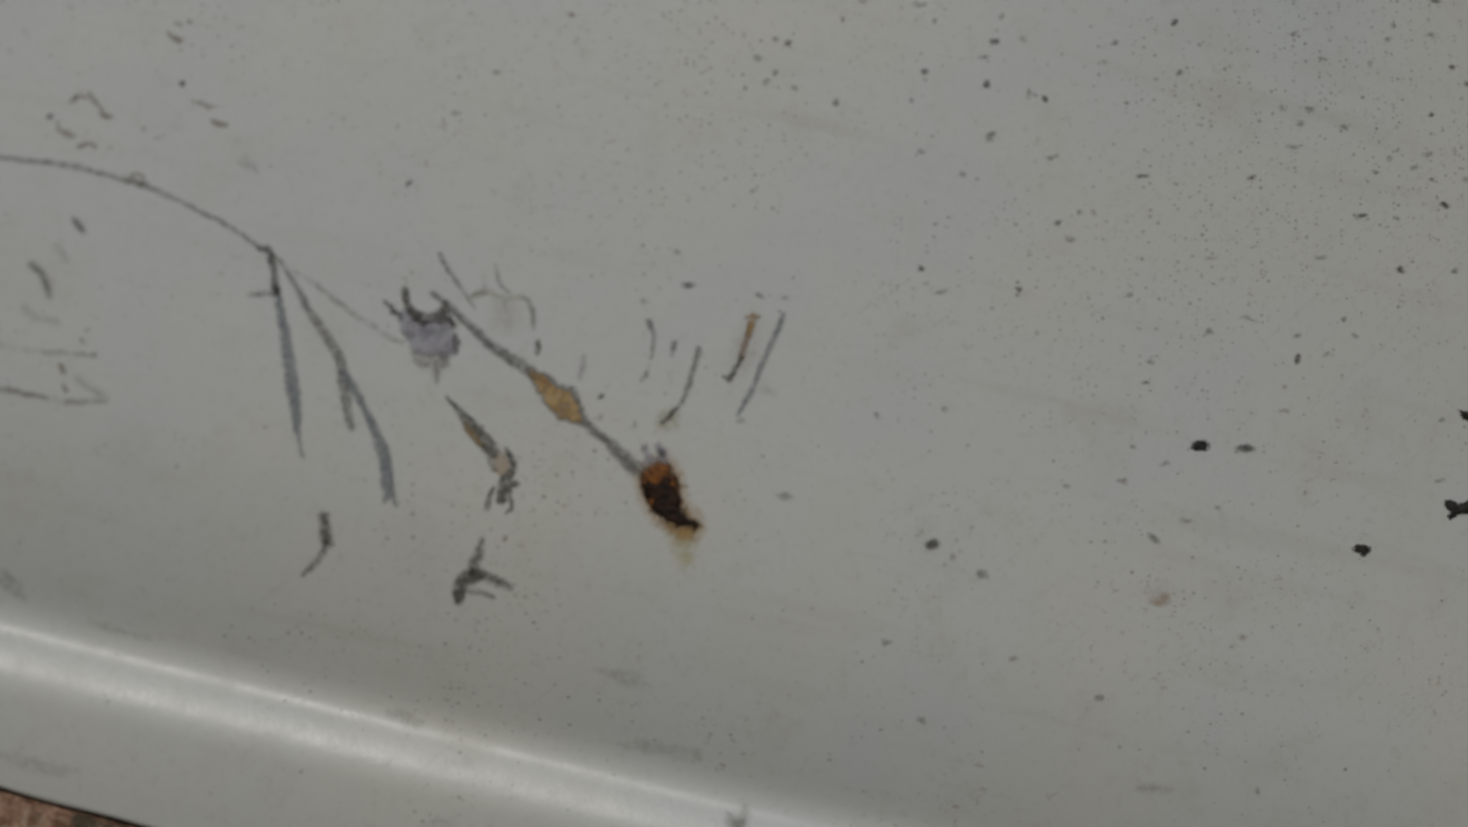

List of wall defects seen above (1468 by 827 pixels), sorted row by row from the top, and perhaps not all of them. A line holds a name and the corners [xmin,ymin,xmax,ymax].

peeling [385,289,458,356]
corrosion [640,444,699,537]